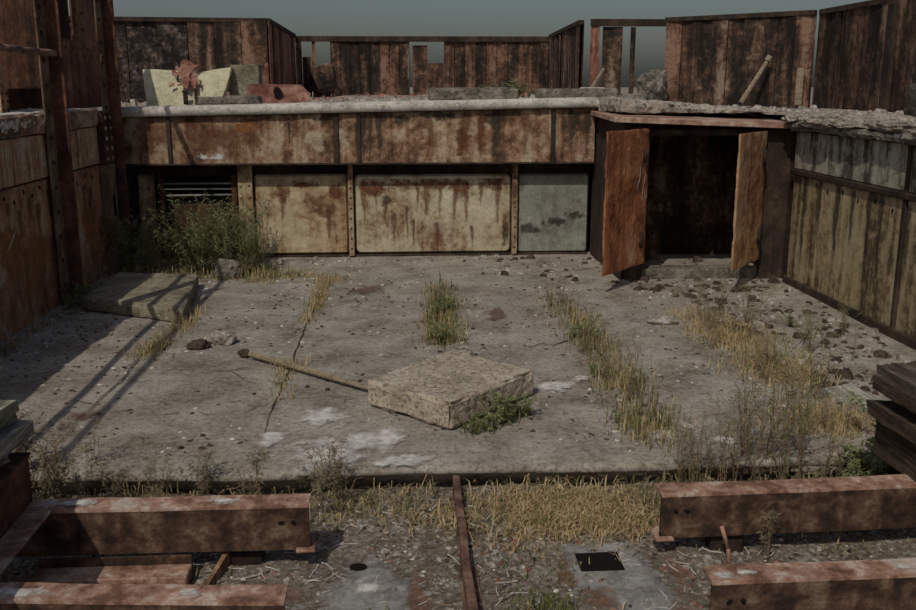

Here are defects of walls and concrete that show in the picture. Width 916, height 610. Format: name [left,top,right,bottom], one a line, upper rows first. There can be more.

peeling [0,118,46,135]
rust [456,112,500,156]
spalling [780,113,916,133]
rust [275,181,333,227]
rust [359,178,503,219]